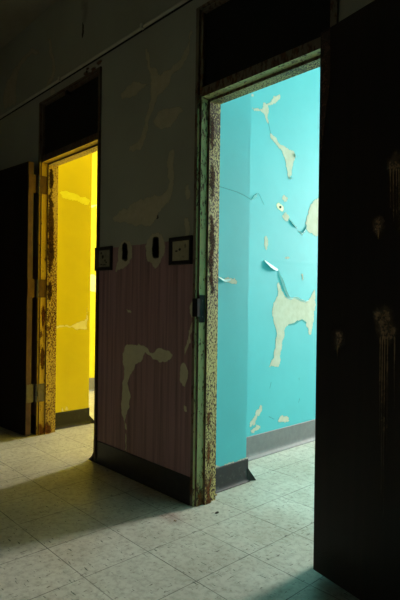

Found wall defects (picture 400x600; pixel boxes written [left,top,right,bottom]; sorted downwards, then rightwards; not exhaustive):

peeling [252,94,296,179]
rust [47,169,55,274]
spalling [145,232,166,269]
rust [208,215,216,294]
peeling [277,195,318,236]
peeling [264,260,316,367]
peeling [121,344,173,450]
peeling [250,405,262,433]
rust [197,475,212,506]